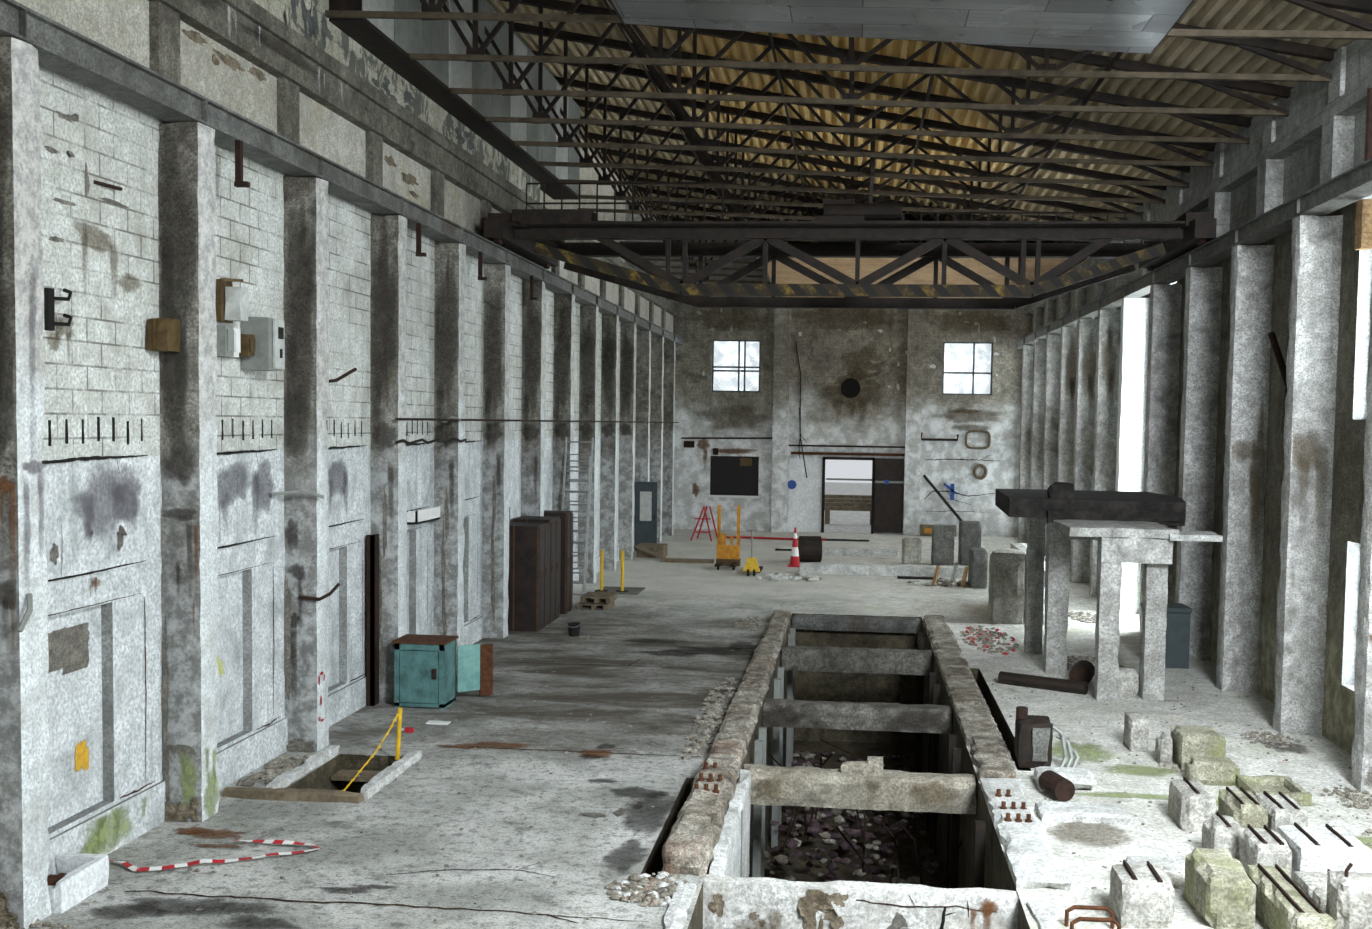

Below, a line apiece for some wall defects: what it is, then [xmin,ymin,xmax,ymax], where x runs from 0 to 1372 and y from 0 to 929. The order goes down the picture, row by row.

water stain [80,474,139,529]
water stain [217,464,272,504]
peeling [62,661,89,675]
crack [856,896,983,929]